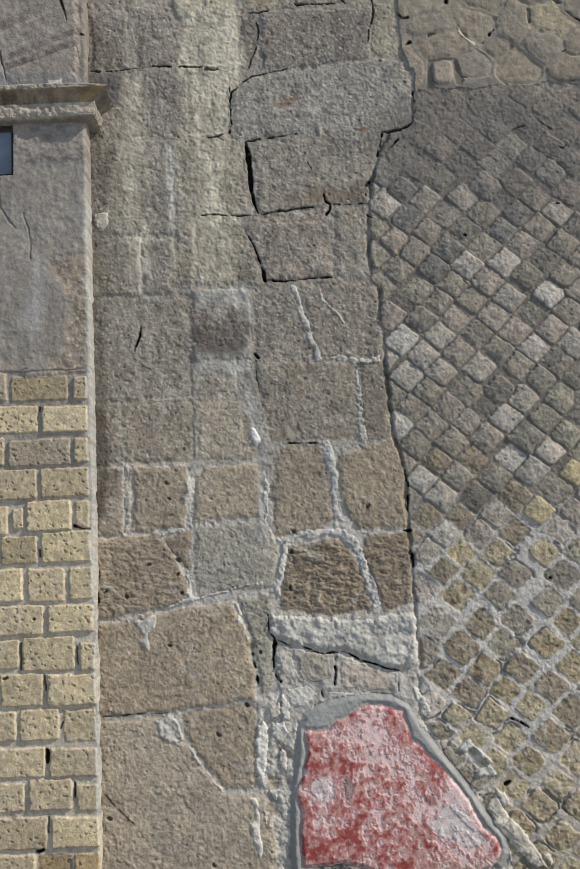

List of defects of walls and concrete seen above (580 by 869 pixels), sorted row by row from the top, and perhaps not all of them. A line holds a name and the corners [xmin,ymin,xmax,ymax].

crack [152,64,218,72]
crack [202,11,380,443]
crack [161,440,399,697]
crack [403,470,412,532]